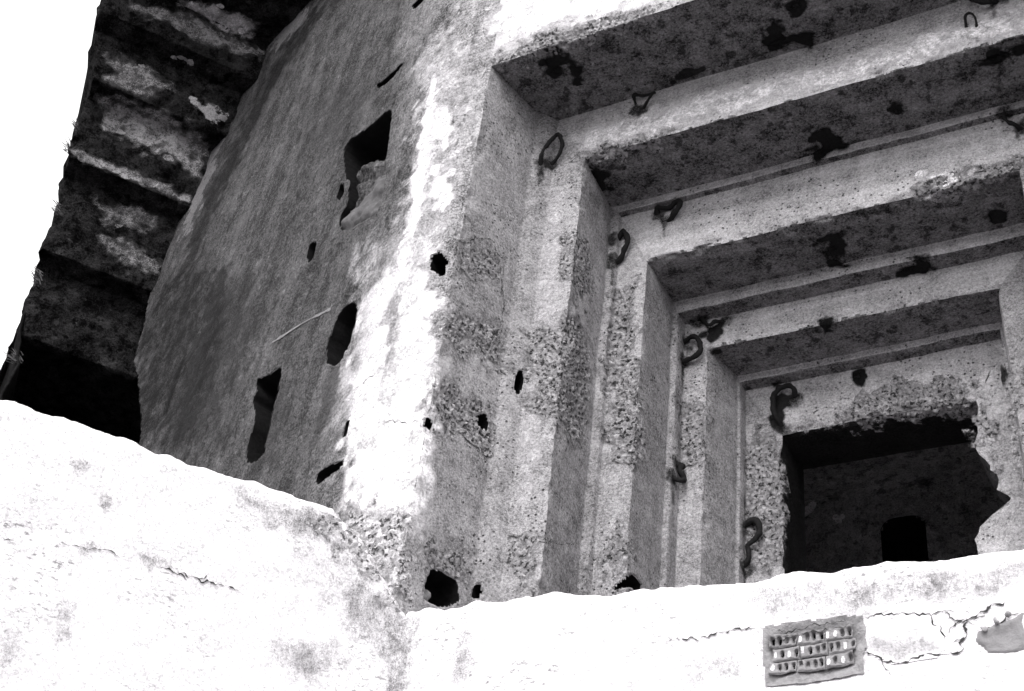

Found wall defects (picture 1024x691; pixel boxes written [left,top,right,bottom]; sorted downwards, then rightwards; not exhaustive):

peeling [304,74,646,617]
rust [680,316,731,383]
rust [768,382,803,437]
spalling [822,346,1024,474]
crack [161,567,235,590]
crack [863,598,1019,674]
spalling [976,610,1024,654]